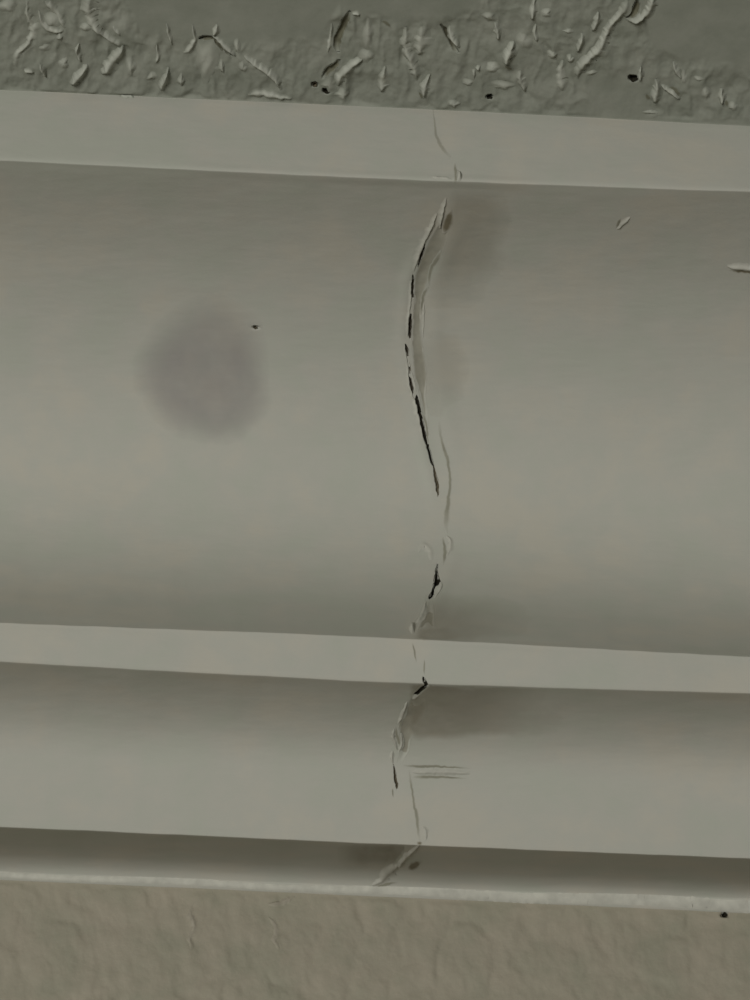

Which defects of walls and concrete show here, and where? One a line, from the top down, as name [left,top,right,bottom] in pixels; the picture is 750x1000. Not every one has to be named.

peeling [0,0,66,77]
peeling [58,0,137,86]
peeling [146,44,185,91]
peeling [184,24,292,100]
peeling [313,10,391,101]
peeling [399,24,460,108]
peeling [462,0,551,99]
peeling [547,0,659,91]
peeling [629,61,739,114]
crack [372,110,462,887]